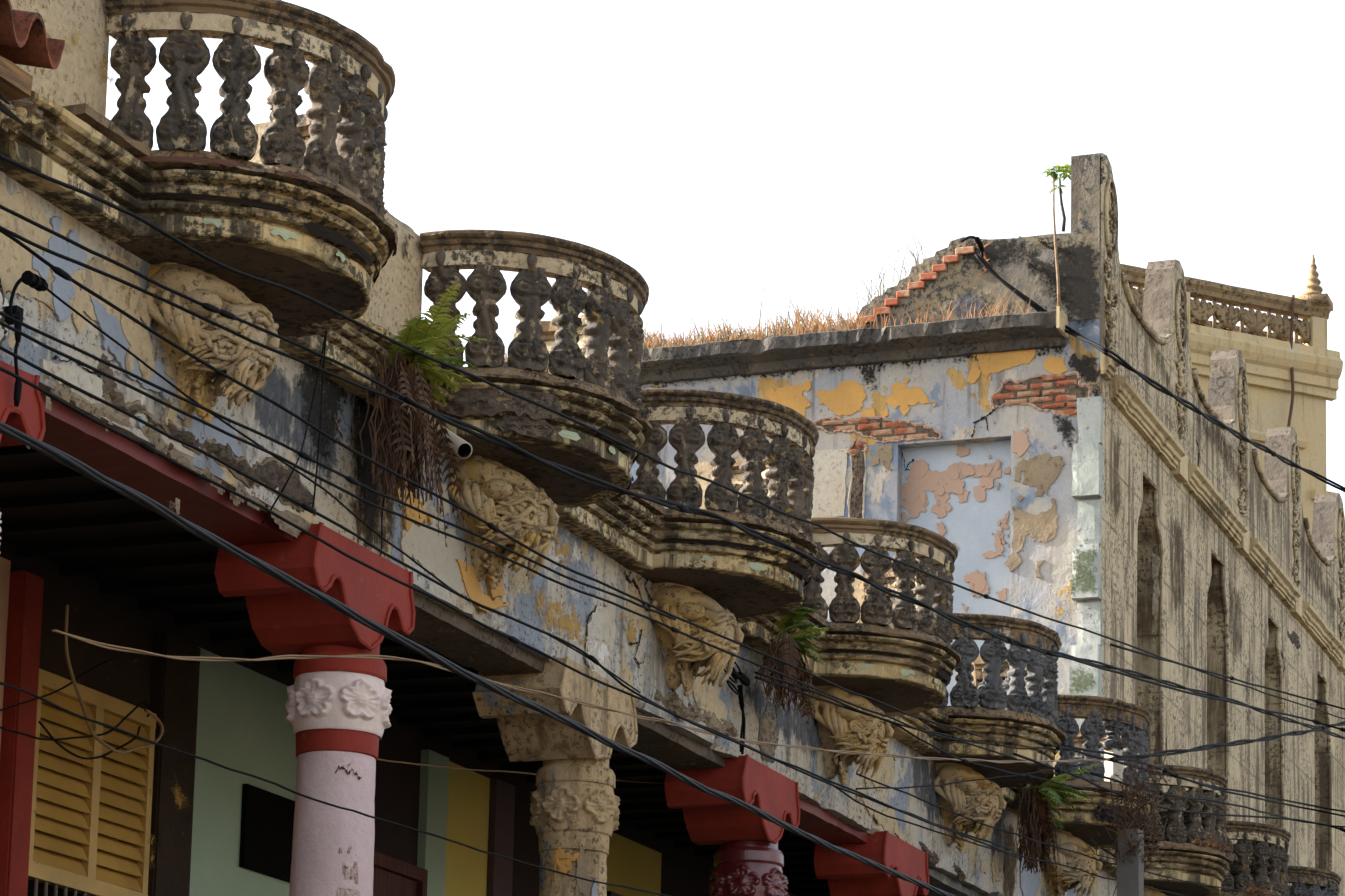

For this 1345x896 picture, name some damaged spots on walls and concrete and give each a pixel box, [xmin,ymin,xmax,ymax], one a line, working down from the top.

leakage [951,212,1103,326]
peeling [0,176,317,538]
flaking render [967,349,1092,417]
peeling [766,377,1065,613]
leakage [1112,440,1121,523]
leakage [1196,405,1271,537]
peeling [748,562,766,571]
leakage [1171,518,1187,613]
leakage [1295,532,1339,619]
leakage [1228,584,1250,699]